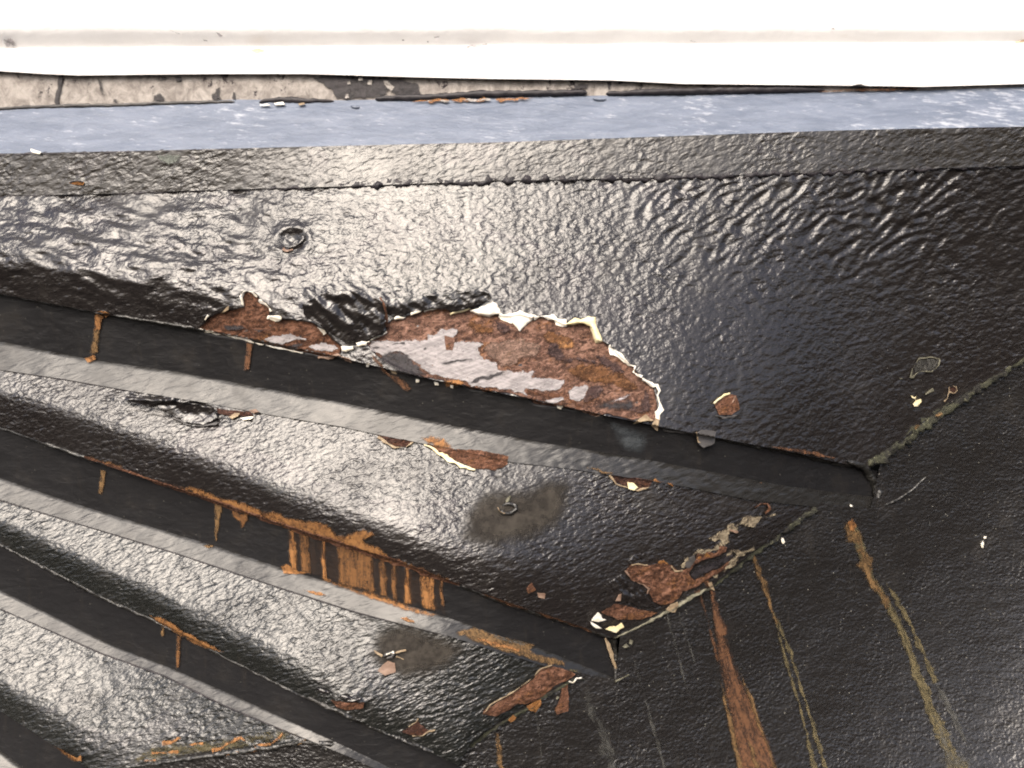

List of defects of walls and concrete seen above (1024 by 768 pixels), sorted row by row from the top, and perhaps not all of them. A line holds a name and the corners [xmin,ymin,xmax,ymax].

corrosion [85,311,108,362]
corrosion [84,456,459,622]
peeling [377,435,508,471]
peeling [199,291,716,448]
damp [465,484,567,544]
peeling [591,503,776,633]
peeling [714,393,740,419]
damp [374,626,461,675]
peeling [483,665,582,722]
corrosion [696,580,776,768]
corrosion [753,556,827,768]
corrosion [846,520,968,768]